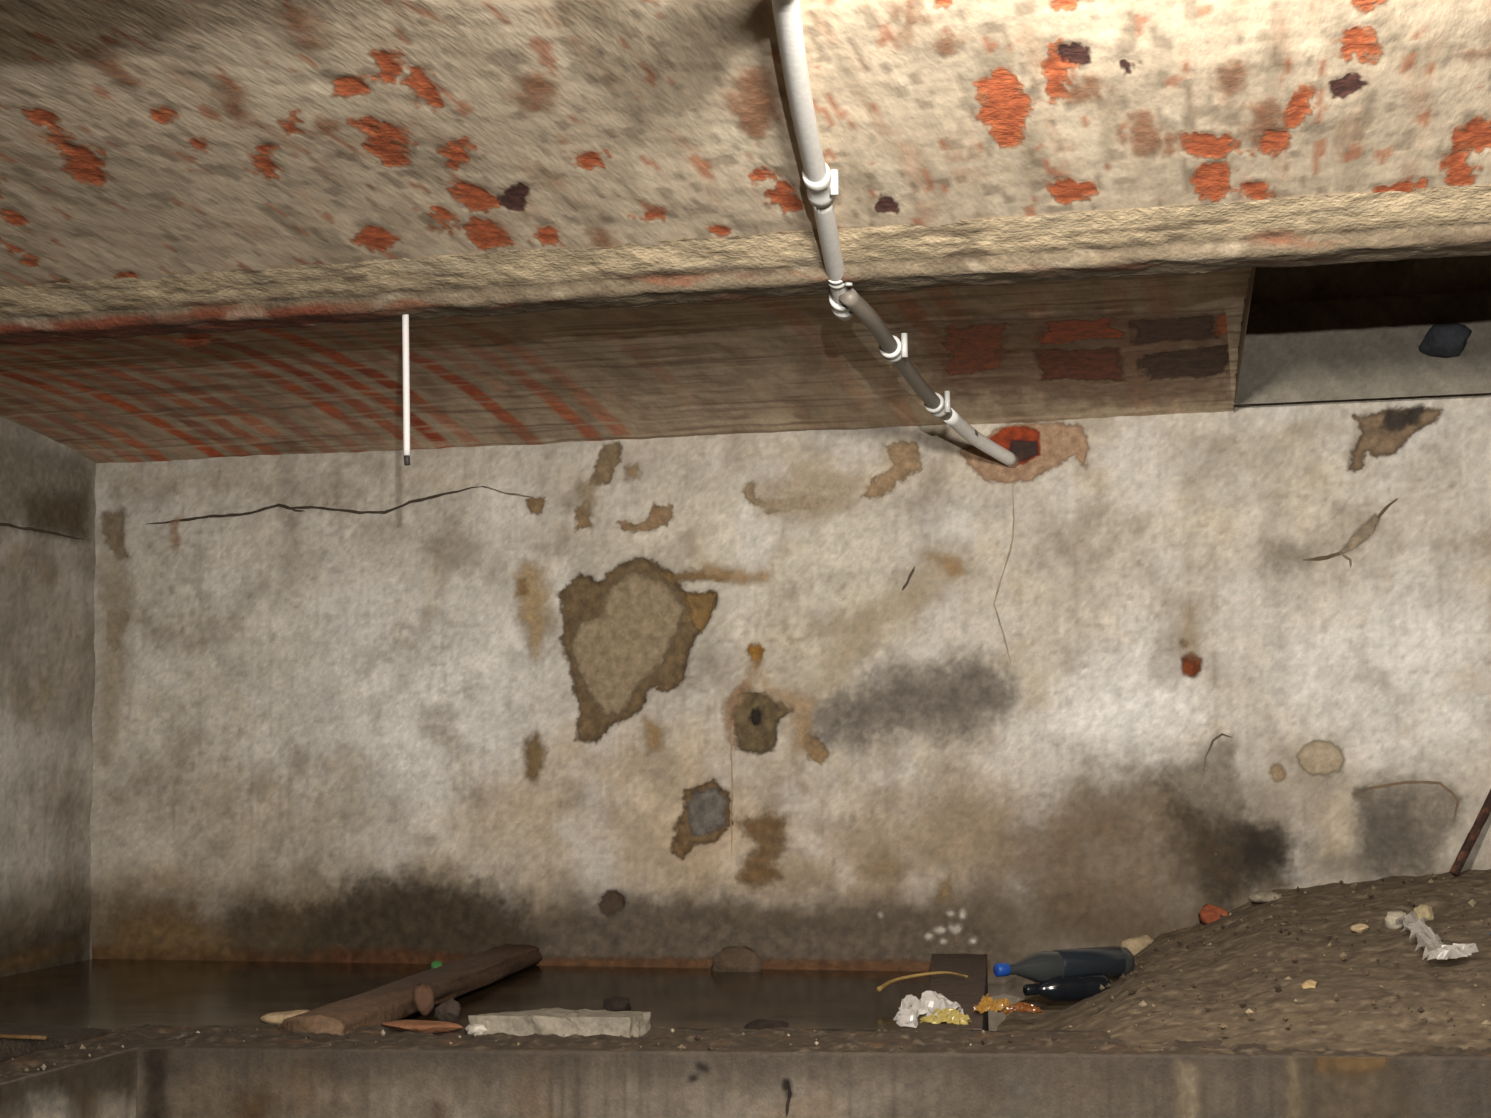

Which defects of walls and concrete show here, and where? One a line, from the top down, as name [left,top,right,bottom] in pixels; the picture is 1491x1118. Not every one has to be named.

spalling [1349,406,1441,472]
crack [148,486,535,546]
flaking render [618,504,673,533]
crack [1270,498,1398,568]
flaking render [0,443,129,750]
spalling [558,557,731,743]
spalling [724,683,793,754]
spalling [671,779,733,860]
damp [740,814,785,886]
damp [1352,781,1461,877]
damp [101,877,1011,978]
damp [0,1049,164,1118]